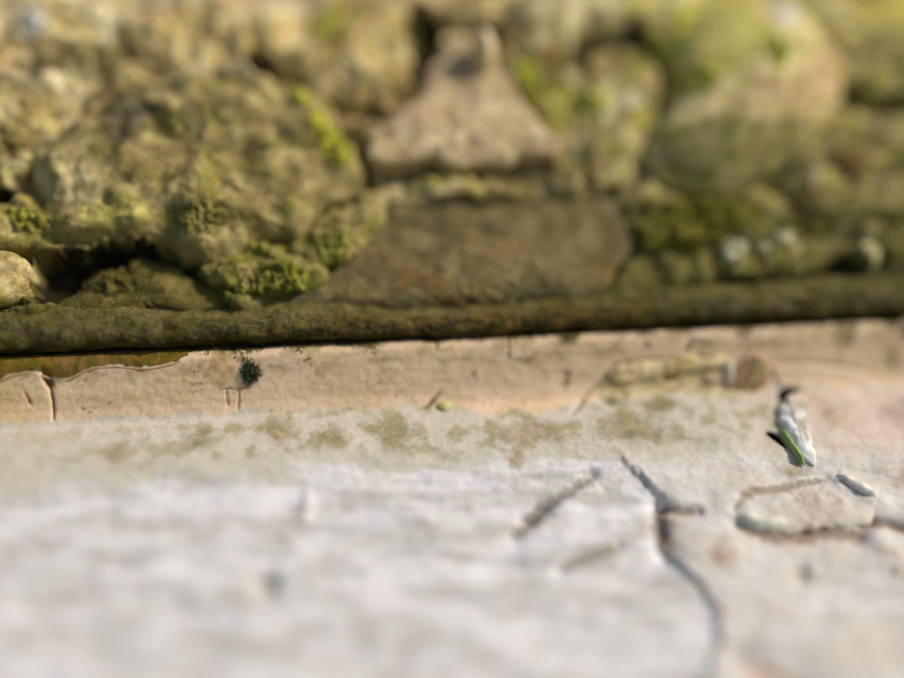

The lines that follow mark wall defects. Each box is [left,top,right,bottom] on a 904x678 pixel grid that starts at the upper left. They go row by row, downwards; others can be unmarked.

peeling [0,348,190,383]
peeling [723,350,771,392]